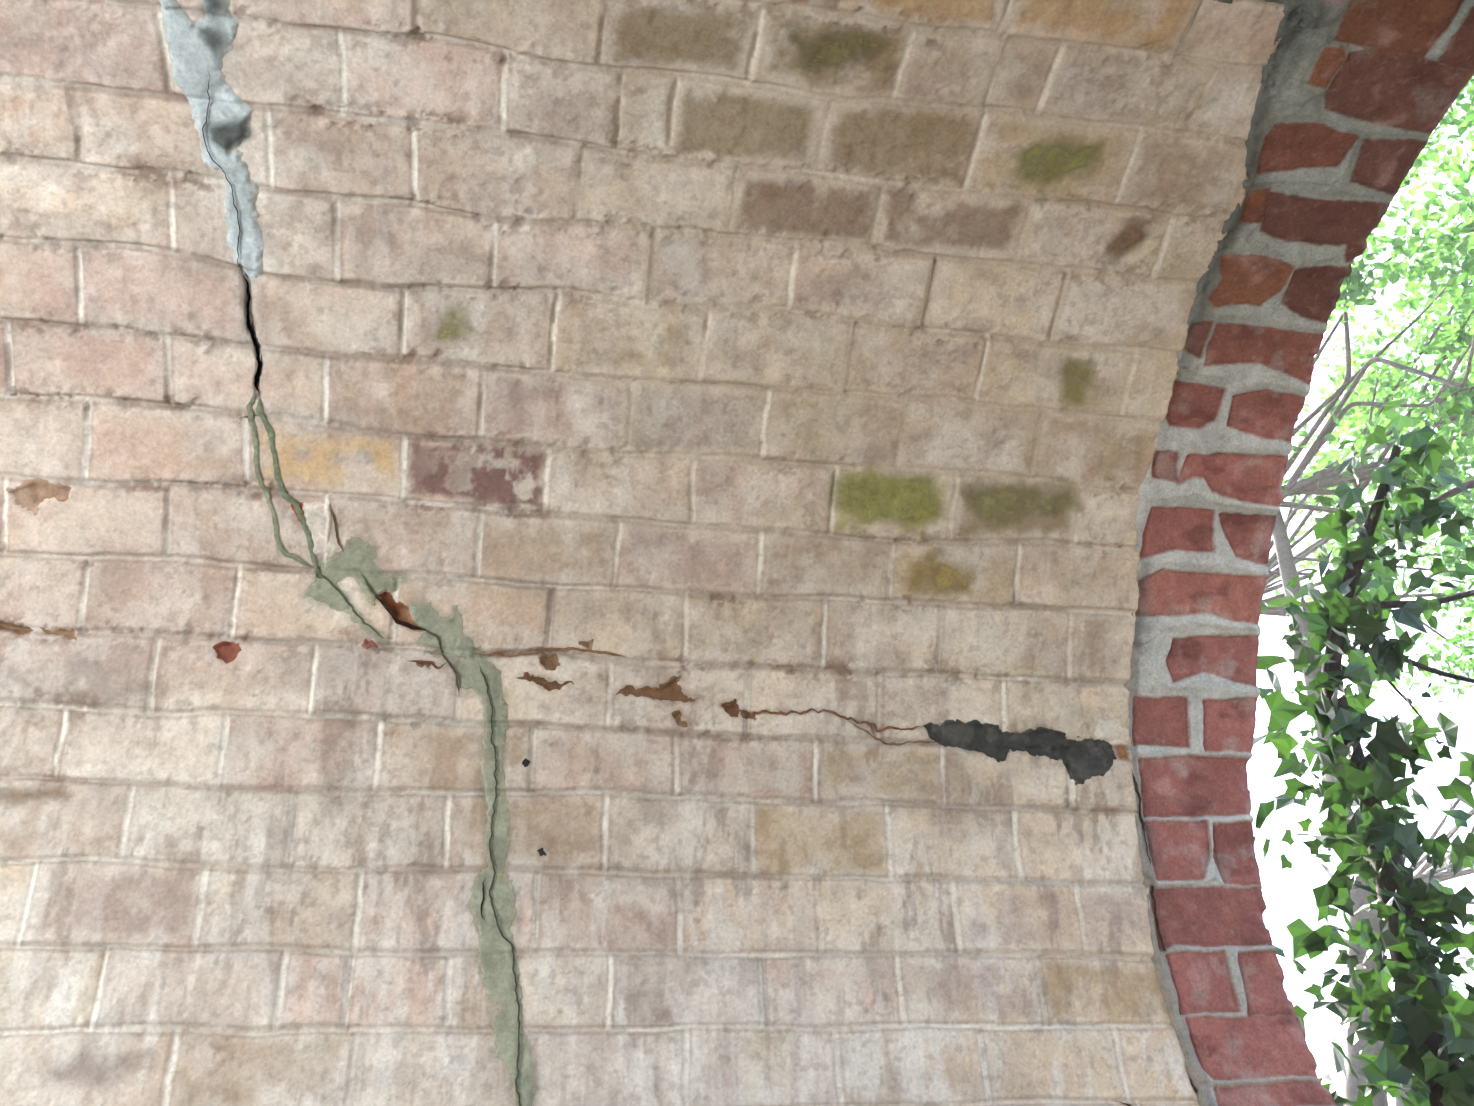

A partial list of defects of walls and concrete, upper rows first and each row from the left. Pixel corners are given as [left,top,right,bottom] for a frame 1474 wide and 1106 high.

water stain [201,0,220,52]
water stain [210,120,246,150]
crack [202,69,625,1106]
peeling [517,652,574,691]
crack [721,703,937,745]
peeling [923,719,1117,785]